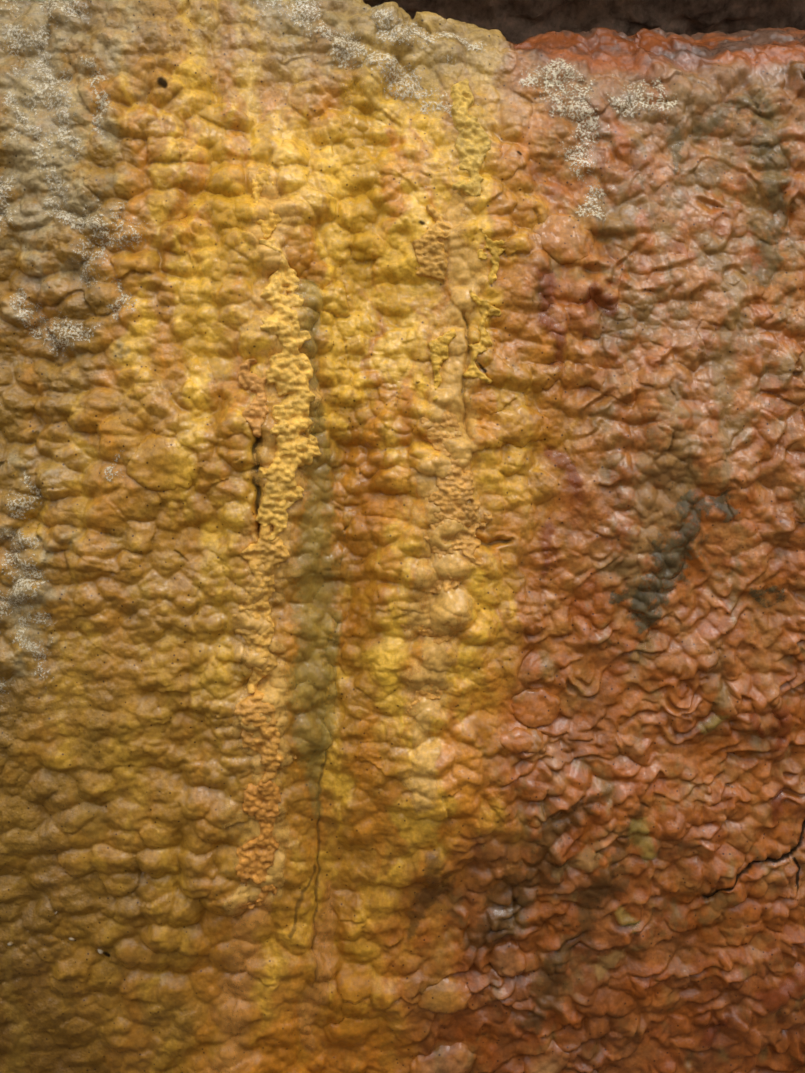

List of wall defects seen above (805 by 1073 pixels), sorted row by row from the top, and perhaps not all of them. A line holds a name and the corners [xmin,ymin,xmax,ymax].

rust [513,28,717,54]
efflorescence [607,74,678,119]
efflorescence [0,0,148,287]
efflorescence [520,58,614,221]
efflorescence [9,288,100,357]
efflorescence [108,275,137,320]
efflorescence [0,470,56,688]
damp [609,489,738,634]
damp [750,586,785,608]
crack [702,820,805,898]